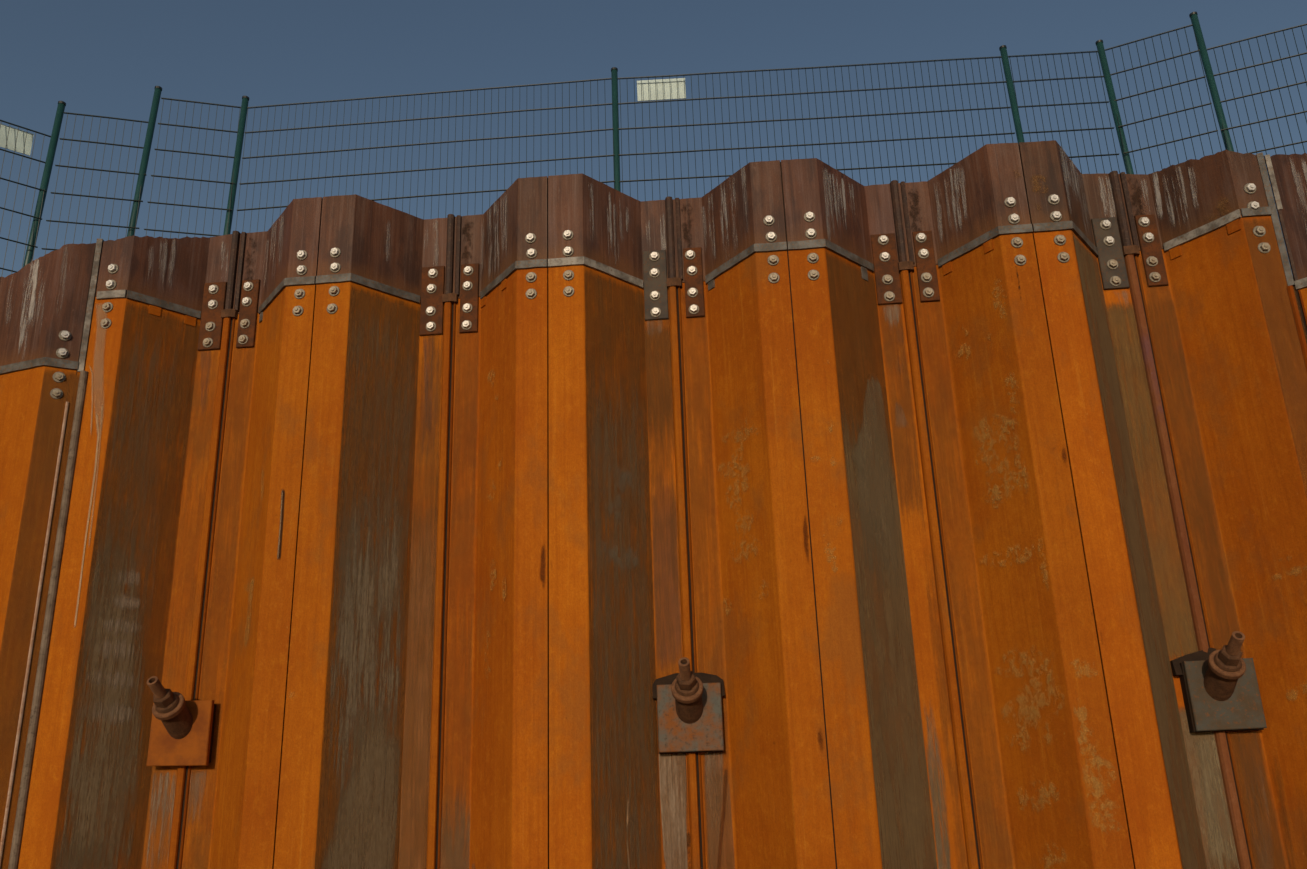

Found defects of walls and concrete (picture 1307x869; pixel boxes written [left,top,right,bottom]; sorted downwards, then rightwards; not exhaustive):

leakage [50,305,200,869]
leakage [315,287,470,869]
leakage [826,253,951,869]